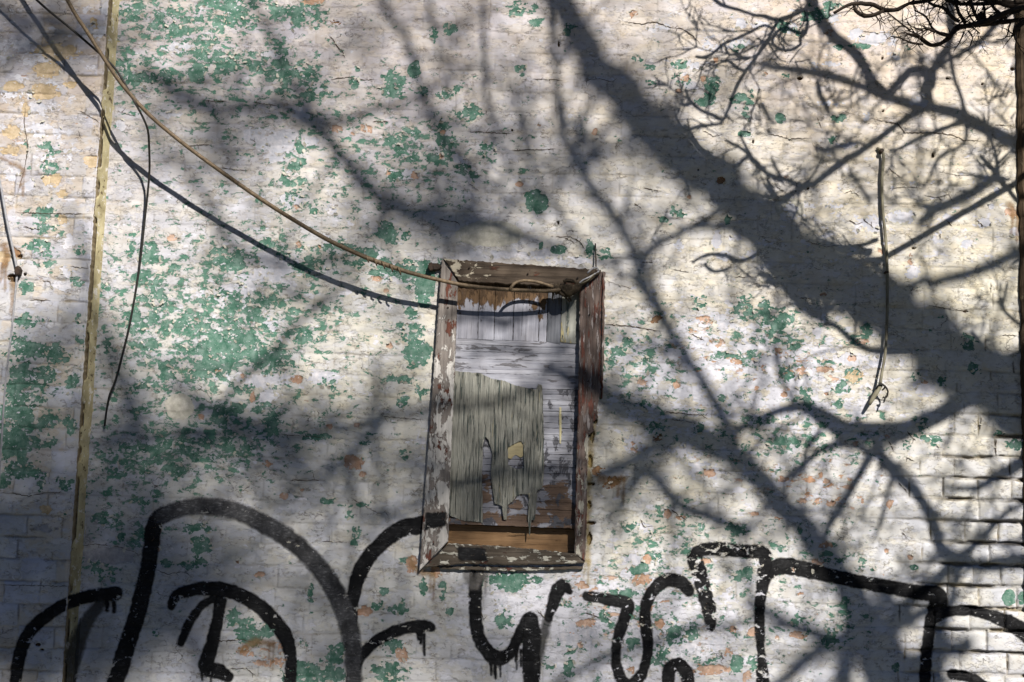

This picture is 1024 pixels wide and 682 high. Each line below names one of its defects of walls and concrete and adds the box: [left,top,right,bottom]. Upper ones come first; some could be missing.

peeling [0,0,341,295]
peeling [330,59,483,185]
peeling [89,218,436,482]
peeling [604,333,632,368]
peeling [688,295,948,420]
peeling [0,312,90,533]
peeling [745,416,830,457]
peeling [725,512,759,552]
peeling [560,549,662,628]
peeling [730,561,764,583]
peeling [226,607,346,682]
peeling [365,637,413,682]